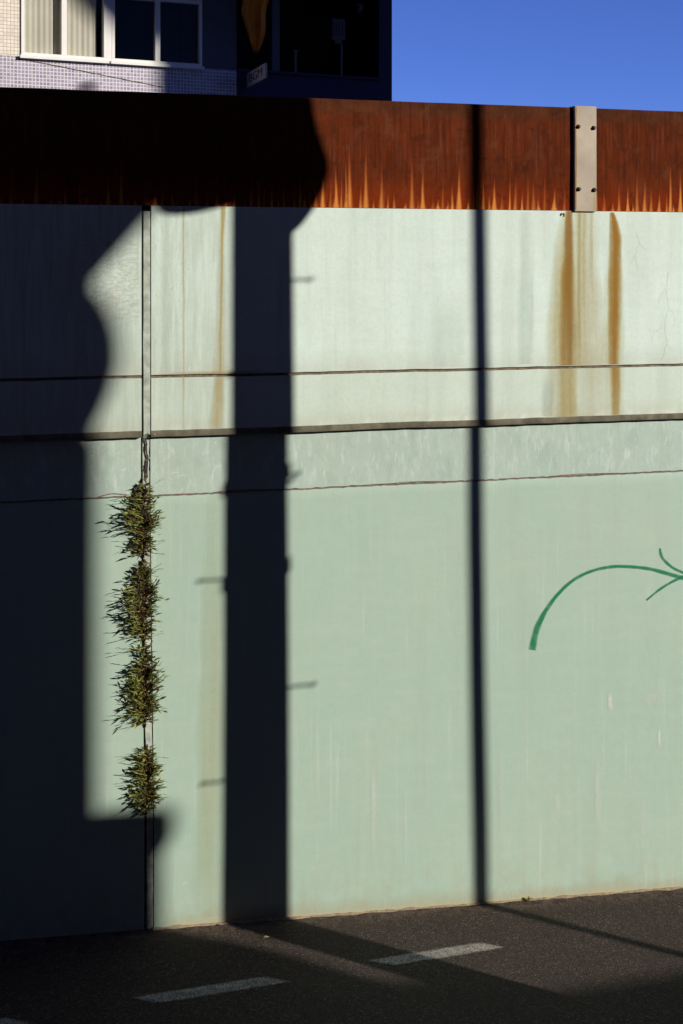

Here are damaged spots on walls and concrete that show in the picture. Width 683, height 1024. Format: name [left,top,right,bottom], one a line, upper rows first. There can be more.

rust [0,106,580,366]